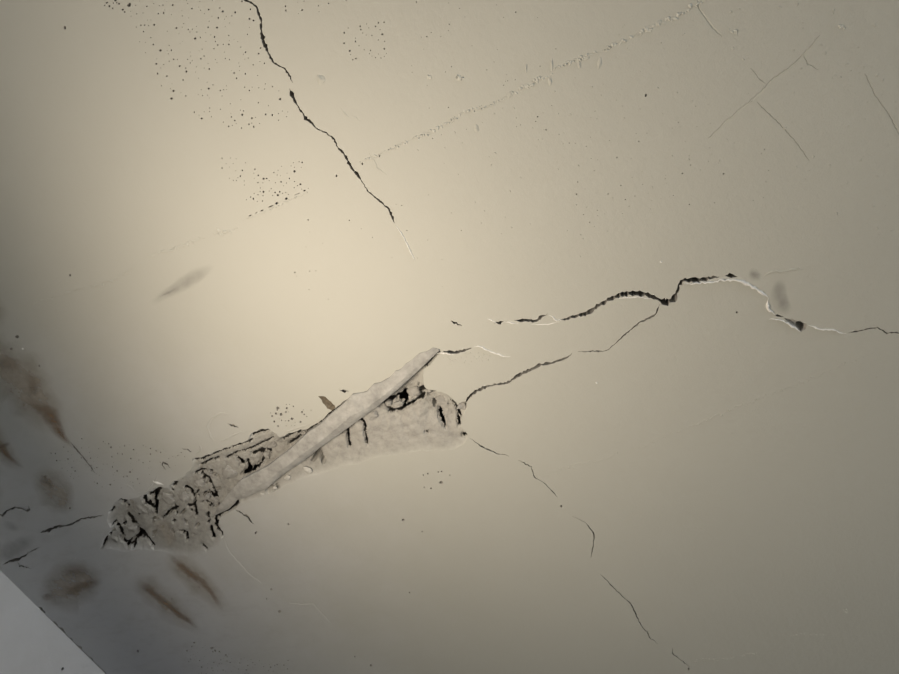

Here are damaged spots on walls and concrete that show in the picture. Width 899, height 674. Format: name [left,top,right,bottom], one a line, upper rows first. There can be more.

crack [244,0,415,260]
crack [437,267,899,401]
crack [0,507,30,517]
crack [2,515,102,569]
flaking render [99,348,471,556]
crack [473,440,557,497]
crack [39,607,106,674]
crack [601,575,686,664]